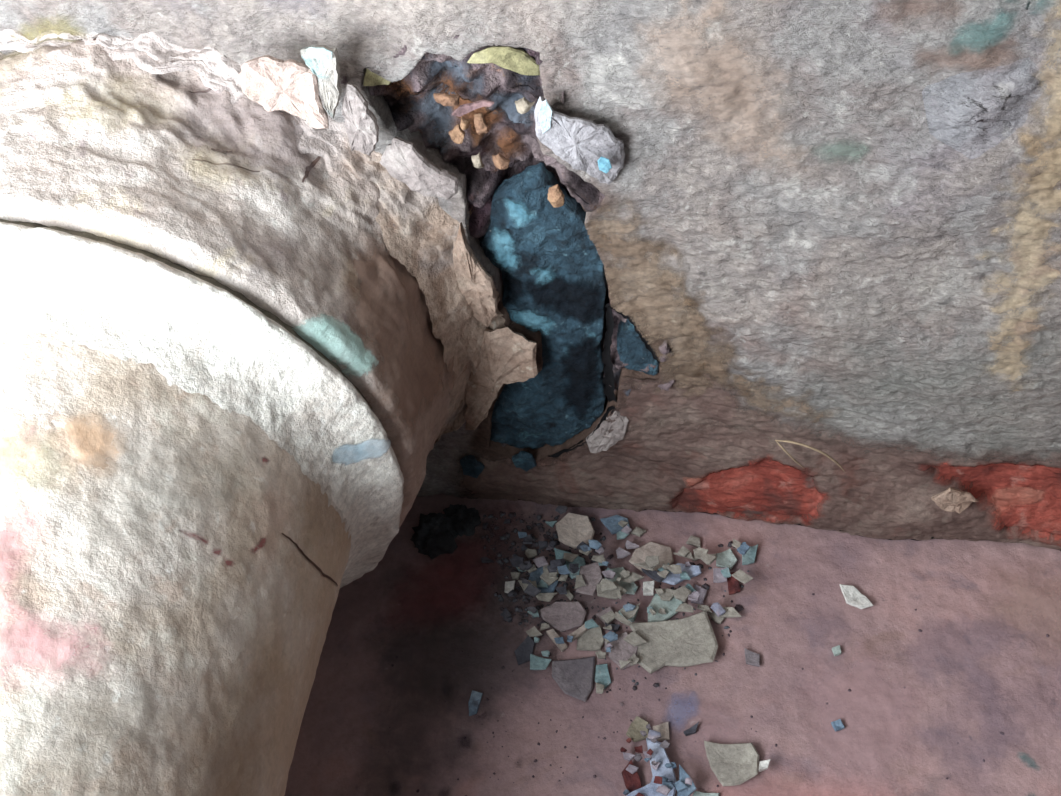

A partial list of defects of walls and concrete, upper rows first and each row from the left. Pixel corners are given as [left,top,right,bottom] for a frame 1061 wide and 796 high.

spalling [301,45,674,472]
peeling [669,457,827,525]
peeling [918,463,1061,541]
crack [282,533,338,587]